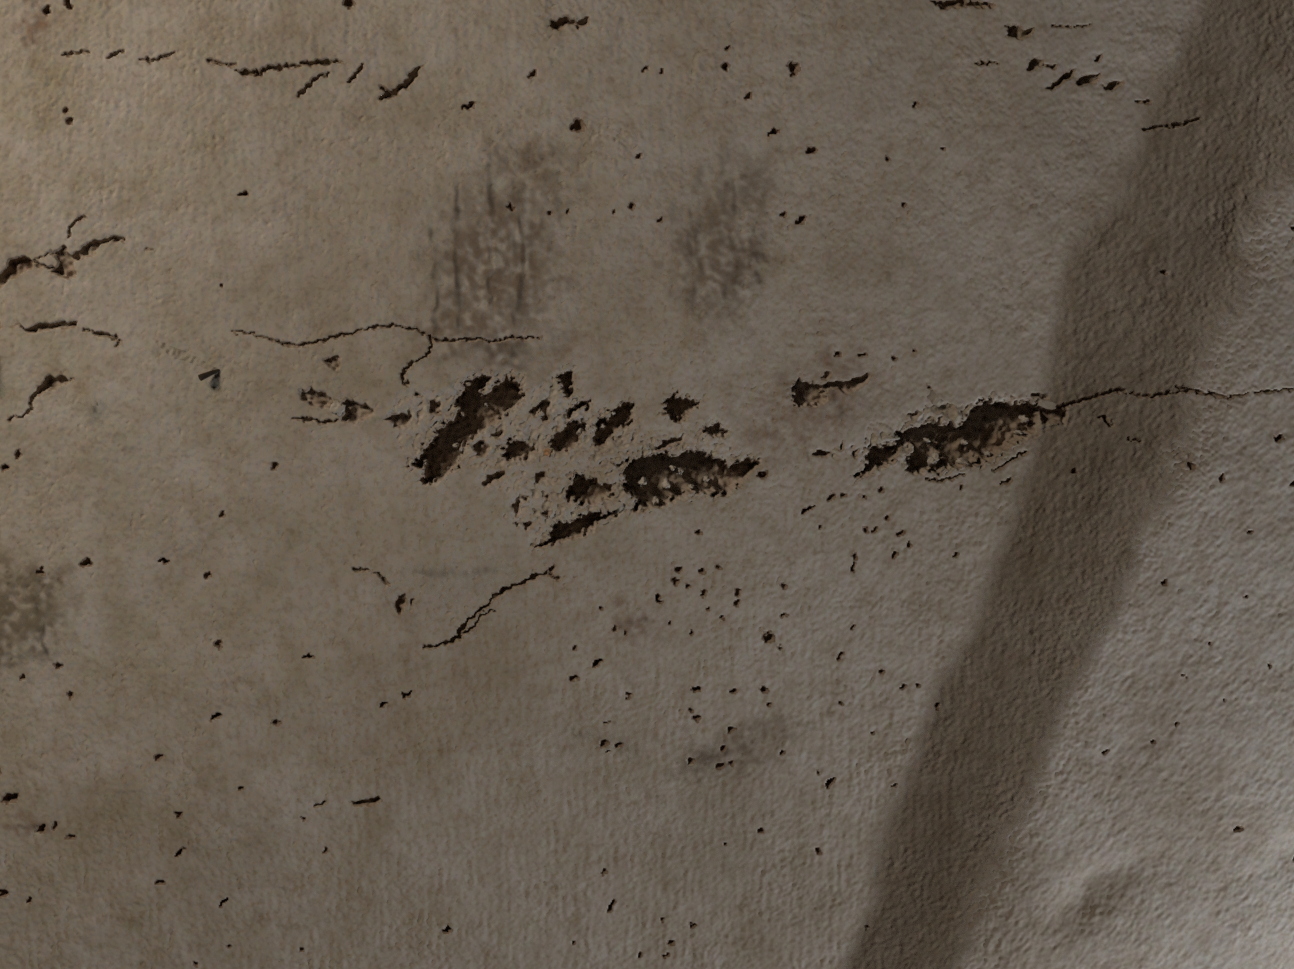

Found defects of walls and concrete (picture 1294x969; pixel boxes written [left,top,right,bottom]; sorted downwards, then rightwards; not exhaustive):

spalling [720,45,731,72]
spalling [786,60,801,77]
crack [0,214,154,289]
crack [0,320,123,348]
spalling [322,356,341,372]
crack [231,322,543,388]
spalling [790,351,870,408]
crack [1053,385,1294,444]
spalling [292,366,768,548]
spalling [801,385,1069,515]
crack [351,567,415,615]
crack [422,566,561,650]